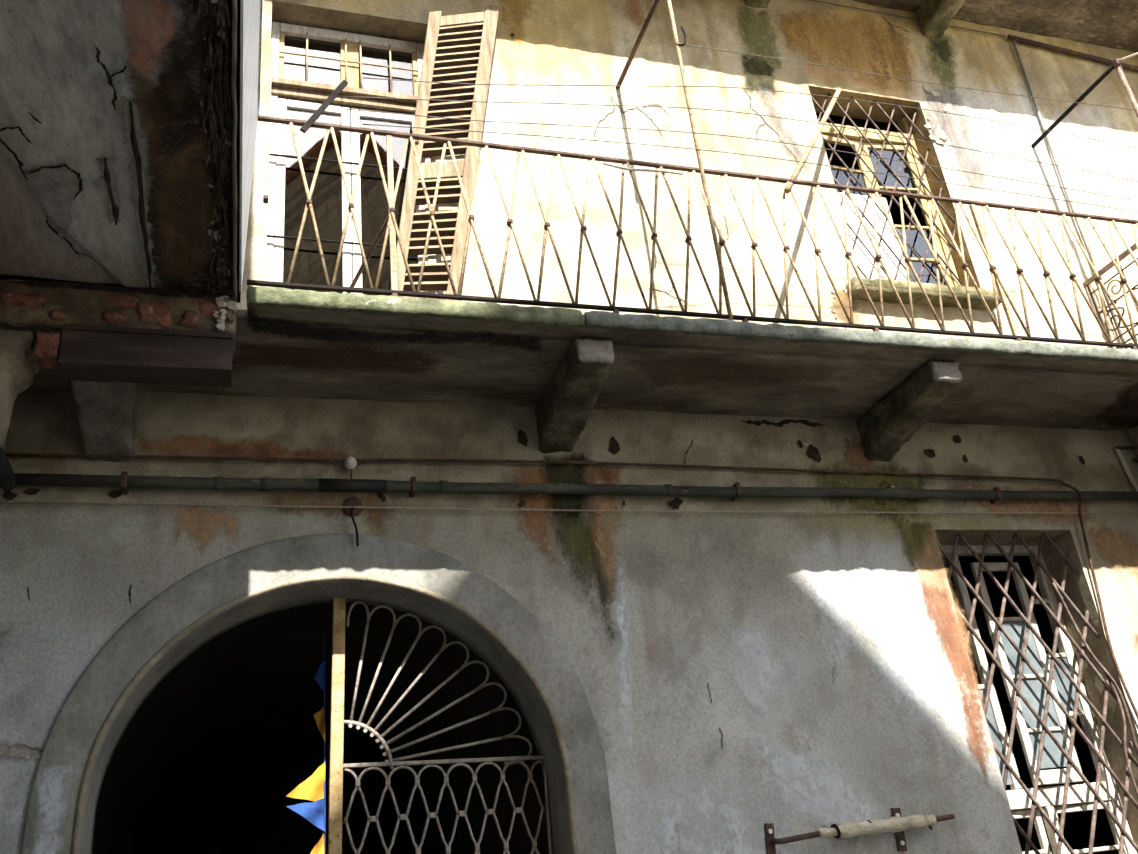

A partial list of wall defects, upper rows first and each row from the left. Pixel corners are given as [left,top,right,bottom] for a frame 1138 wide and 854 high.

crack [0,113,42,180]
water stain [130,0,232,295]
crack [594,92,673,136]
water stain [739,6,806,164]
flaking render [34,331,61,369]
crack [741,419,826,427]
hole [795,440,821,462]
water stain [539,455,632,731]
rust [895,520,986,773]